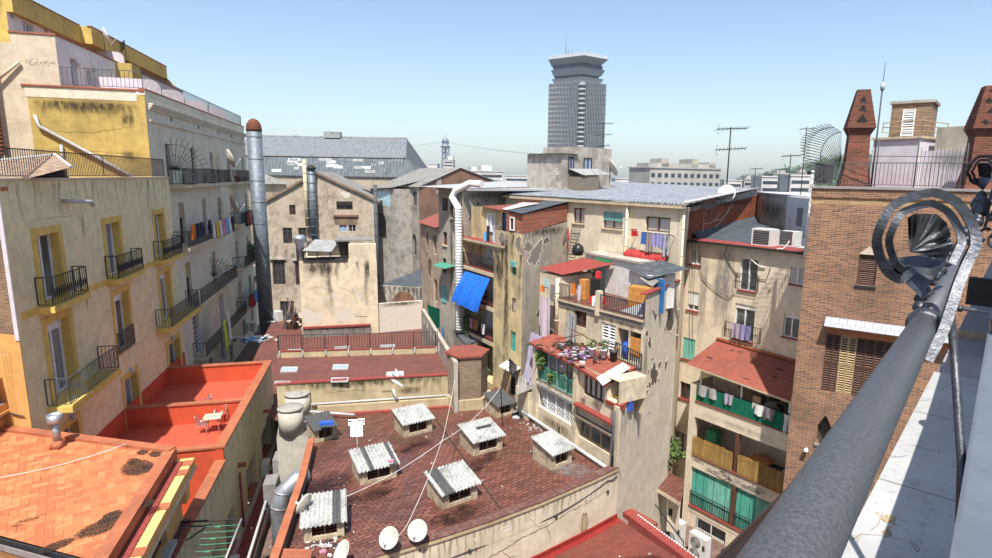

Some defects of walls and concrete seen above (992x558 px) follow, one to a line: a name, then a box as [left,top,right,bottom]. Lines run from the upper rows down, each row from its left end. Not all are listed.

damp [54,102,115,110]
spalling [497,223,551,267]
spalling [643,308,675,397]